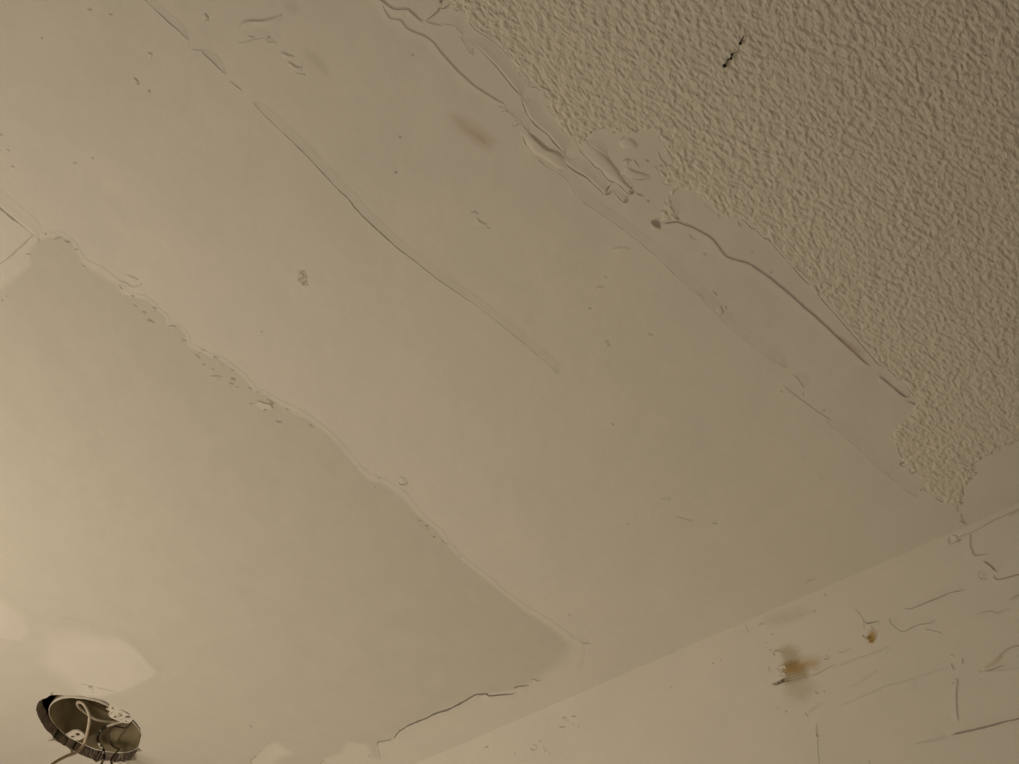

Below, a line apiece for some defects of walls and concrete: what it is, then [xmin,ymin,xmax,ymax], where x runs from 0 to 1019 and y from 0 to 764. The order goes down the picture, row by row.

crack [0,189,42,265]
crack [144,0,559,374]
crack [367,678,541,759]